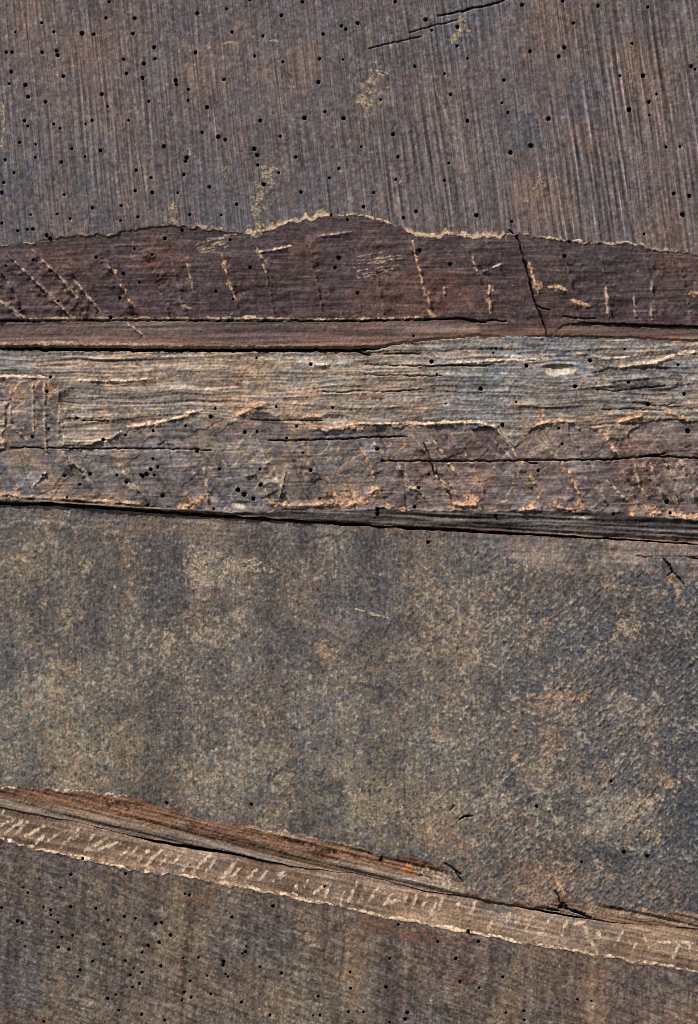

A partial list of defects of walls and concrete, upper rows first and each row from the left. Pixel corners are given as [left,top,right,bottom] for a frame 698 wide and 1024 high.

crack [369,0,505,49]
crack [509,230,698,333]
crack [547,891,591,918]